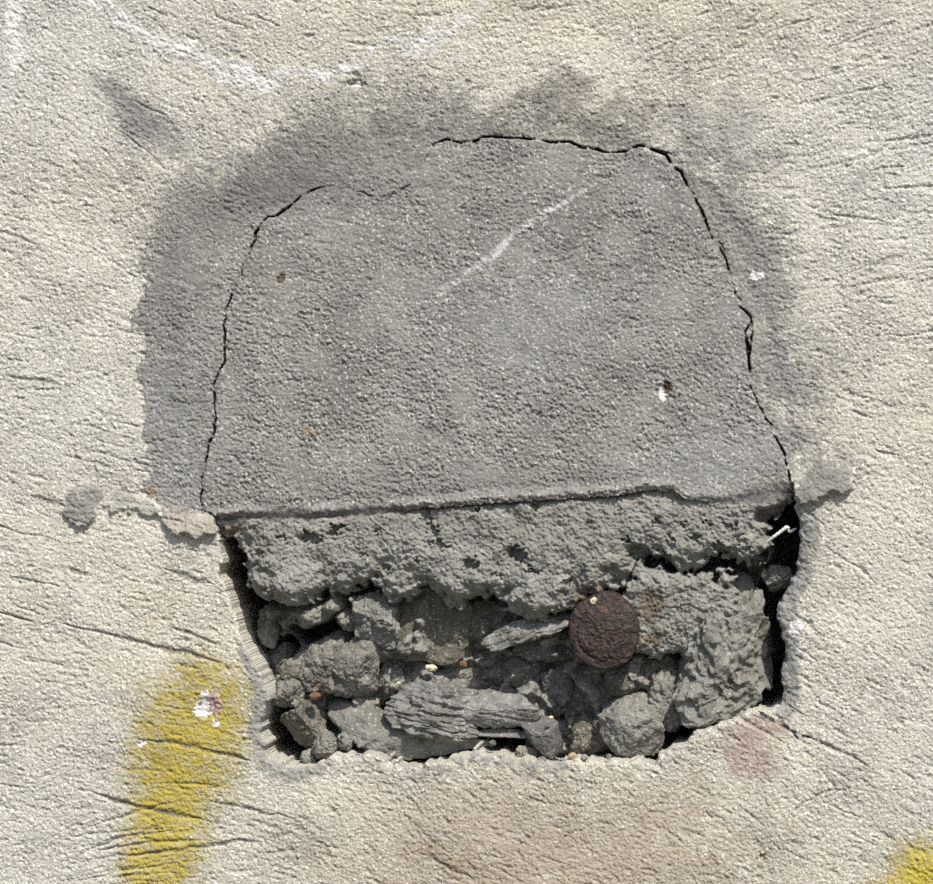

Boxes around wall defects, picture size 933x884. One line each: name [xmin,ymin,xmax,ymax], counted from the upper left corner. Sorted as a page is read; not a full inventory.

crack [200,184,410,538]
crack [427,136,794,491]
spalling [216,482,805,758]